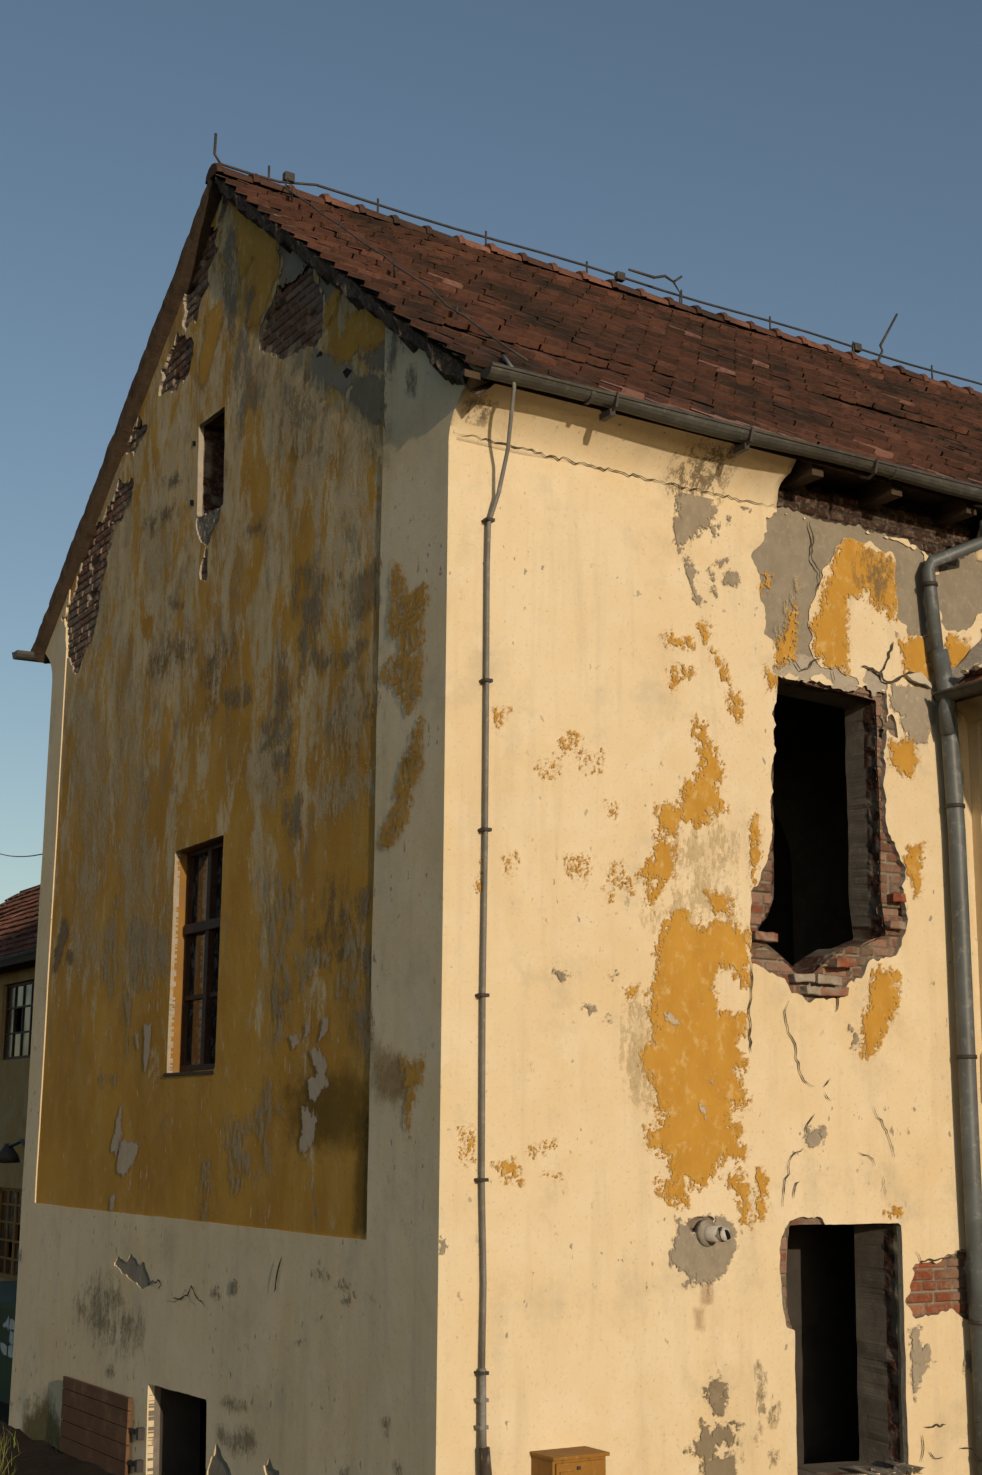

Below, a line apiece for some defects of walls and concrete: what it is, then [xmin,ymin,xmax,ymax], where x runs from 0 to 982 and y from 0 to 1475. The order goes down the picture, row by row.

flaking render [162,196,387,430]
flaking render [65,480,134,673]
peeling [261,553,430,851]
peeling [534,729,606,779]
spalling [658,486,982,783]
peeling [903,842,926,900]
peeling [200,869,372,1221]
peeling [562,711,770,1290]
spalling [803,1125,828,1152]
peeling [848,963,905,1061]
spalling [683,1369,745,1475]
flaking render [905,1251,968,1402]